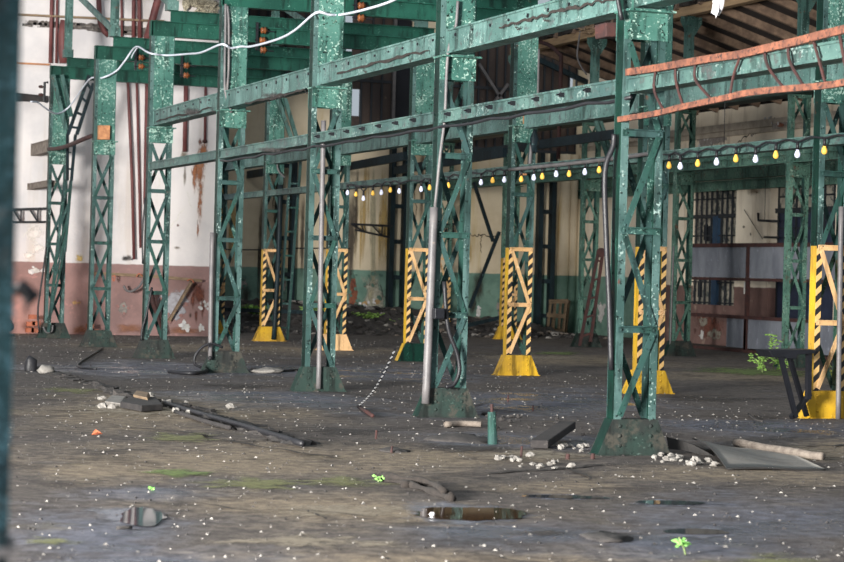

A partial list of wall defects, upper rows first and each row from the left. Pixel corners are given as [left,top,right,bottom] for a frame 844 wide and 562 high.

rust [191,163,204,215]
peeling [157,289,205,332]